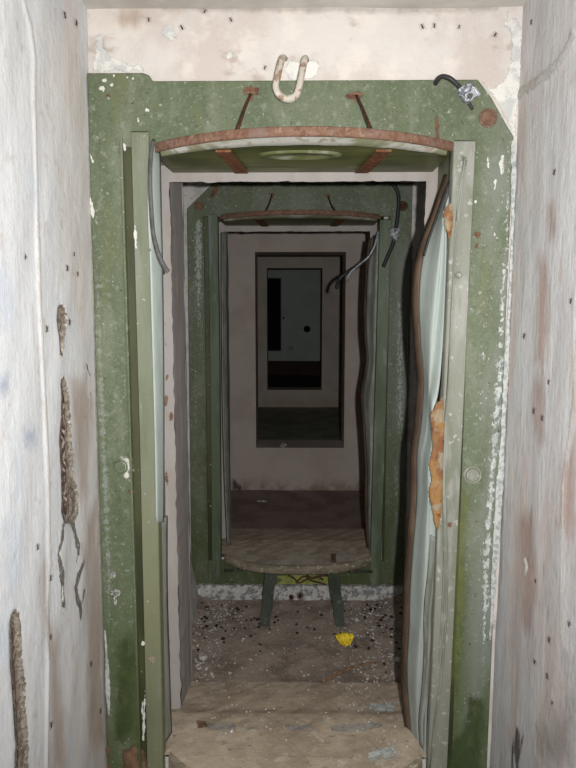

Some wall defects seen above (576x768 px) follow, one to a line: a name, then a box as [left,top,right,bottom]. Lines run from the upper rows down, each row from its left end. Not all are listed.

peeling [93,34,144,99]
peeling [482,11,522,137]
crack [57,376,80,615]